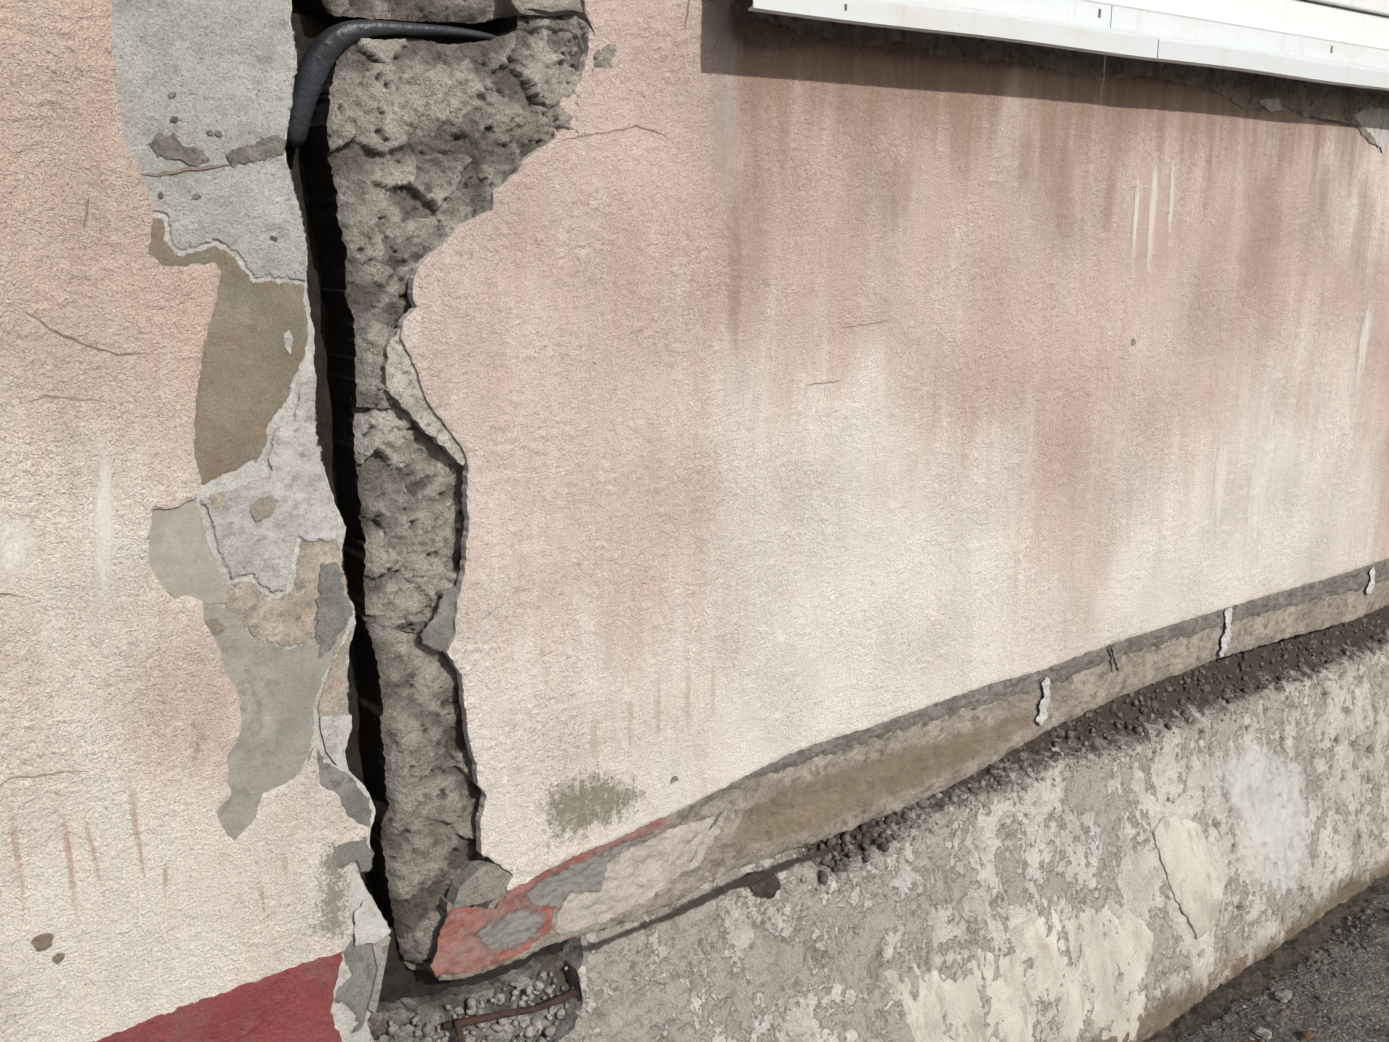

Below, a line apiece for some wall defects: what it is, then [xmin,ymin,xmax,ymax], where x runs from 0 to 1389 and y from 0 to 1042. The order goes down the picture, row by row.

crack [291,0,338,70]
leakage [733,14,946,59]
peeling [735,0,1389,153]
peeling [111,0,308,484]
leakage [1133,172,1173,264]
crack [284,145,345,576]
leakage [1357,309,1370,380]
spalling [148,0,728,1042]
crack [345,639,367,790]
leakage [540,772,645,848]
crack [360,847,836,1003]
rust [441,988,579,1042]